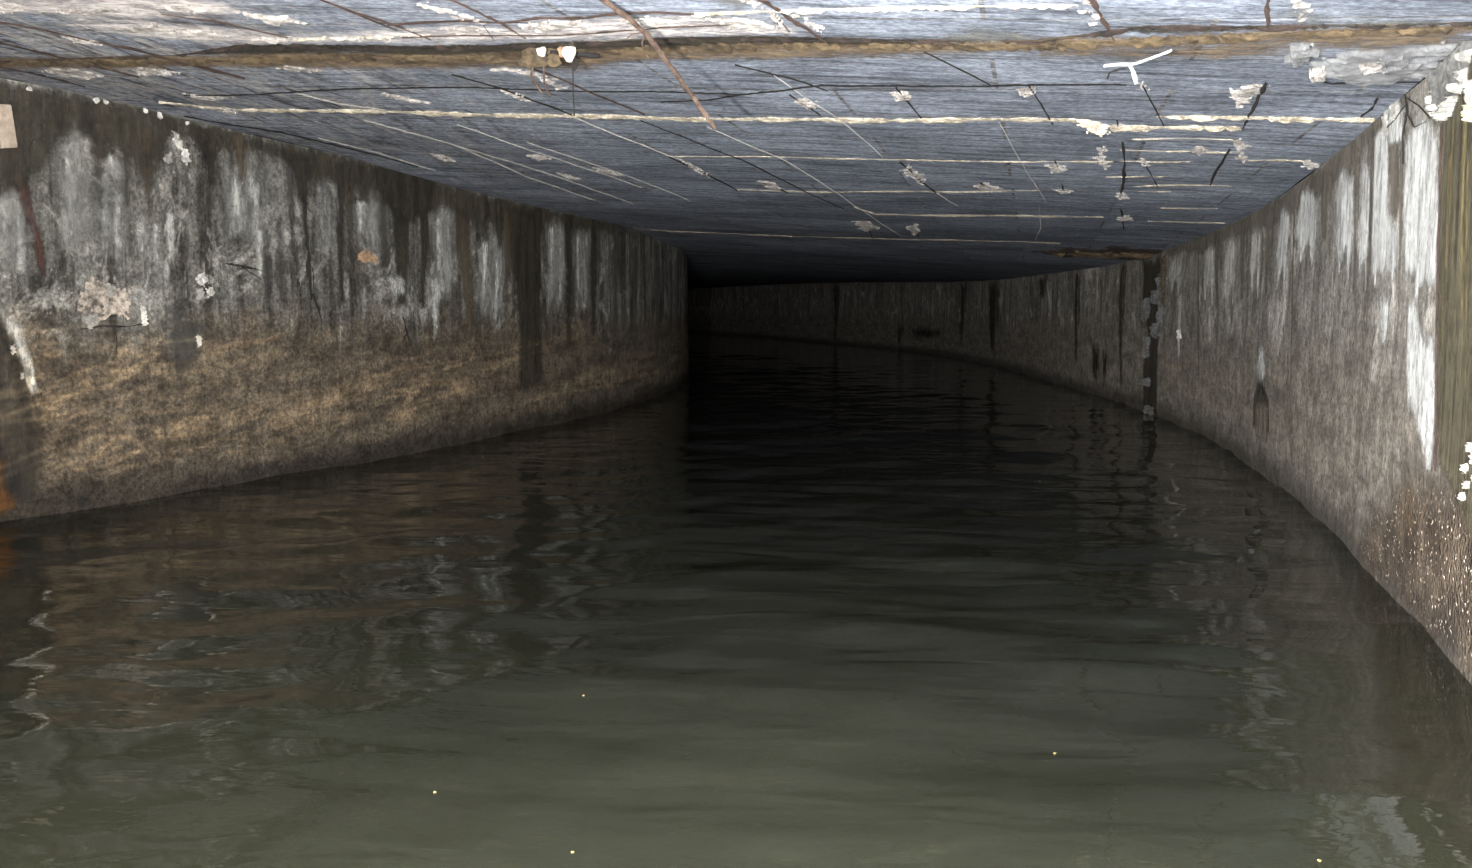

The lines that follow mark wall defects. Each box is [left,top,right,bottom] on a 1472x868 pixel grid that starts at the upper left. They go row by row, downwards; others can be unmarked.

crack [0,0,1165,240]
leakage [545,14,1470,70]
crack [1210,82,1270,186]
crack [1264,0,1314,28]
spalling [1283,33,1472,122]
crack [302,180,322,323]
leakage [0,51,664,389]
leakage [1074,265,1126,381]
leakage [1166,100,1468,466]